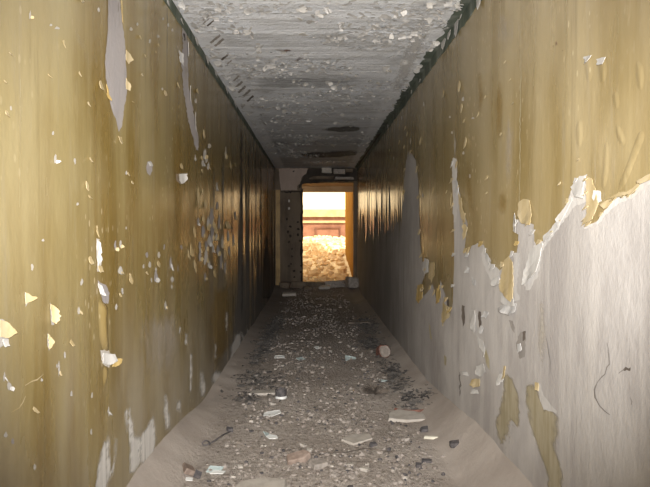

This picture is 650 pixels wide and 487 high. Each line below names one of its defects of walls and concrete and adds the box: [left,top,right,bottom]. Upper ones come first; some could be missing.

peeling [99,0,138,144]
peeling [167,0,463,173]
peeling [0,319,17,347]
peeling [50,304,61,325]
peeling [98,281,123,387]
peeling [143,244,165,282]
peeling [180,187,237,281]
peeling [357,116,650,487]
crack [594,344,624,415]